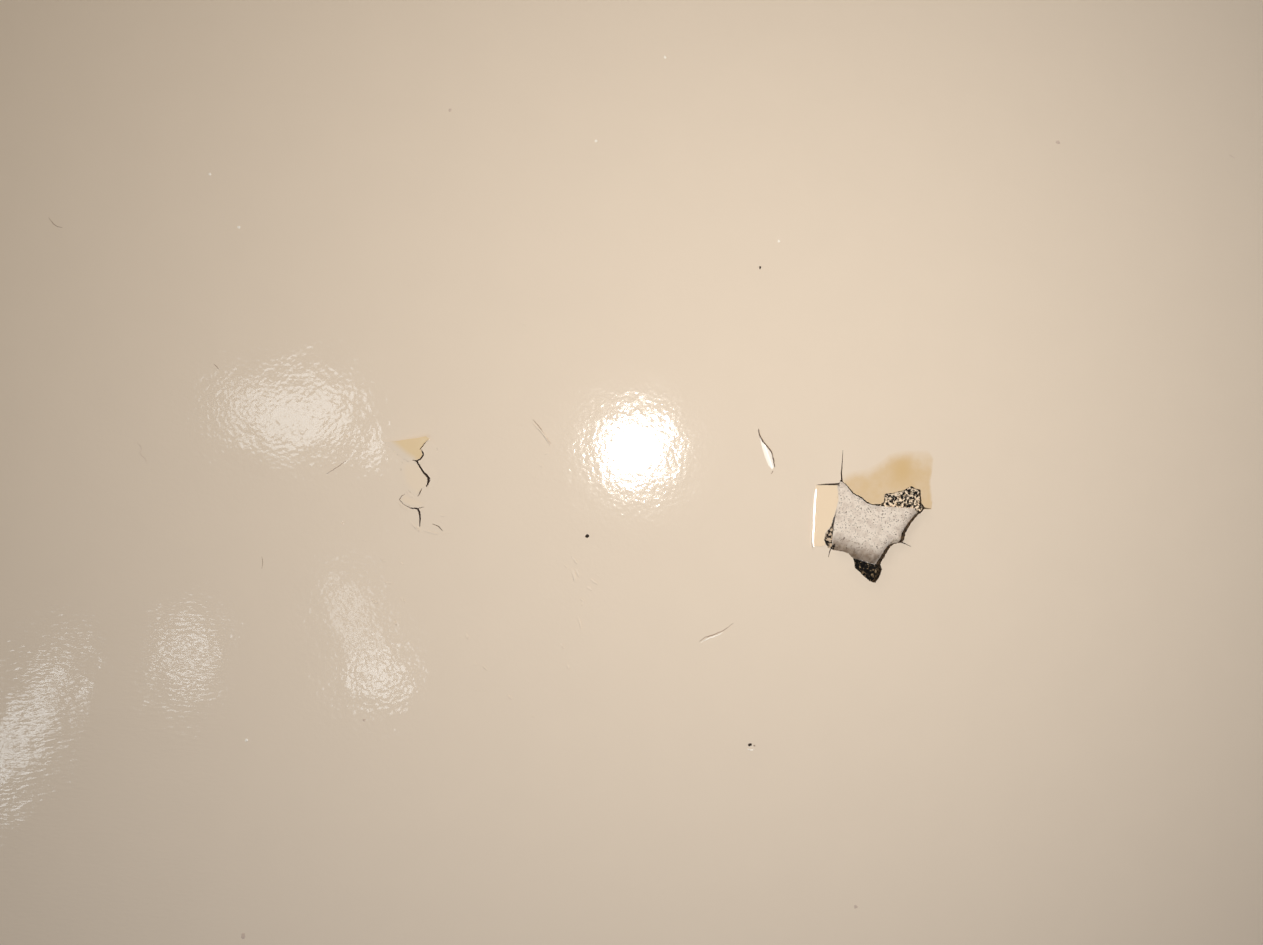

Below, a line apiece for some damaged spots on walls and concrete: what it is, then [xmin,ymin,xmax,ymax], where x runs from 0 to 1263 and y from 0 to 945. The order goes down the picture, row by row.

crack [382,436,452,534]
spalling [779,436,963,625]
water stain [842,450,934,510]